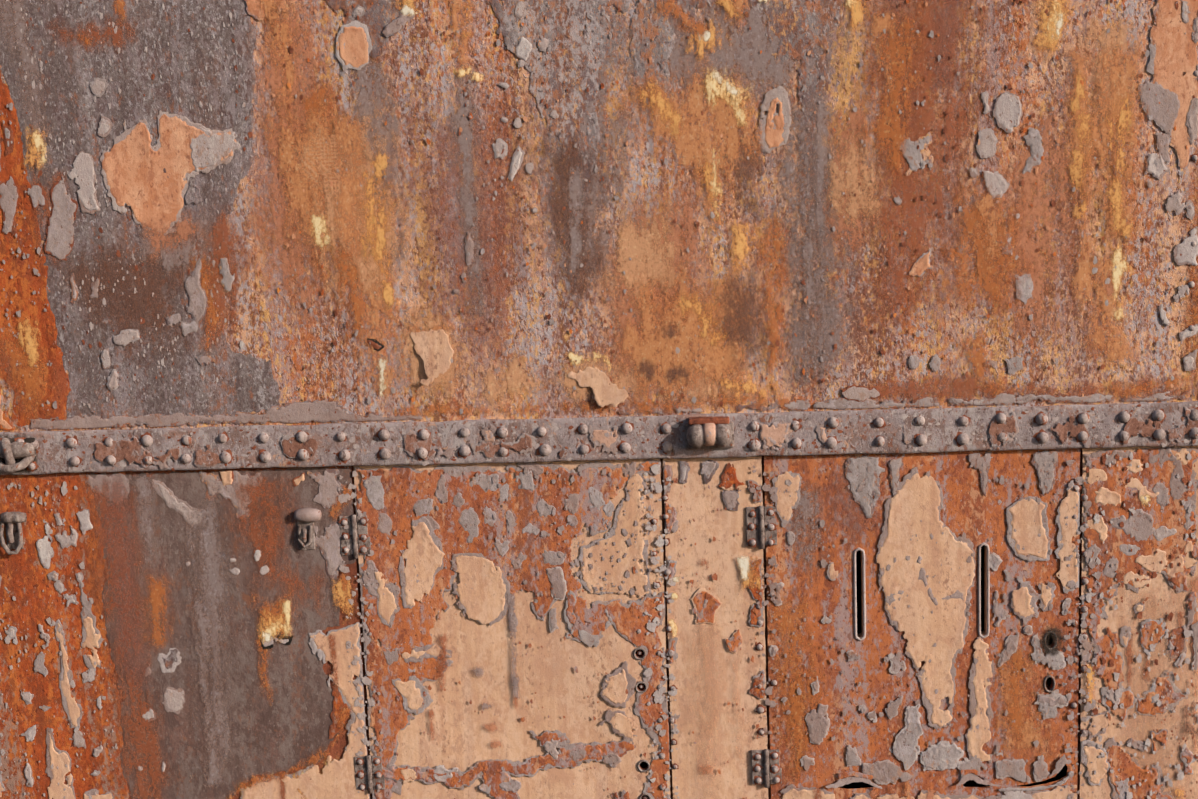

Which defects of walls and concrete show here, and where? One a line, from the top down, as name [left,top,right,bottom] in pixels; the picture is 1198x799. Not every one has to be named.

rust [0,319,46,417]
rust [25,0,548,442]
peeling [0,0,802,799]
rust [507,0,808,459]
peeling [899,132,934,176]
rust [812,0,1176,369]
peeling [969,91,1044,199]
peeling [1160,285,1198,371]
peeling [1165,191,1198,266]
rust [58,433,168,799]
rust [238,479,354,696]
peeling [735,385,1198,799]